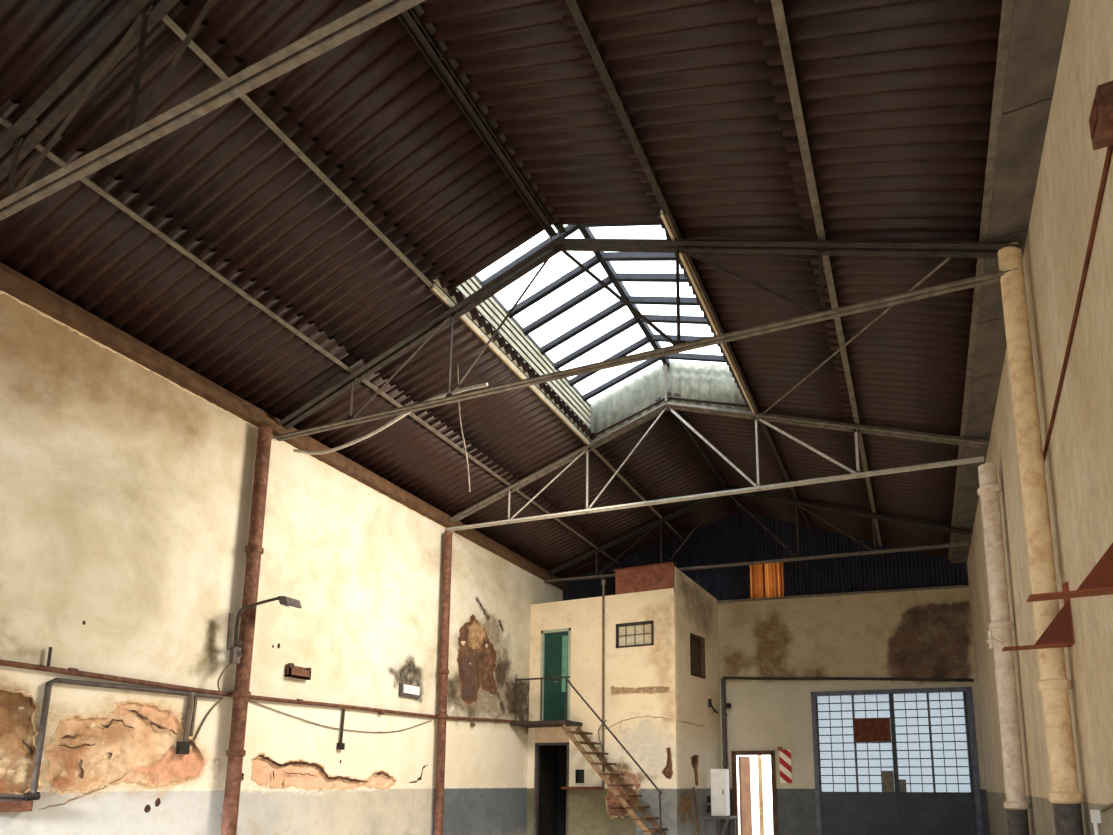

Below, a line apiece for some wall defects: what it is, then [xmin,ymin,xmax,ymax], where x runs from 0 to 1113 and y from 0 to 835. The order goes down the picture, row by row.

flaking render [457,614,498,706]
flaking render [0,688,205,813]
flaking render [241,753,397,791]